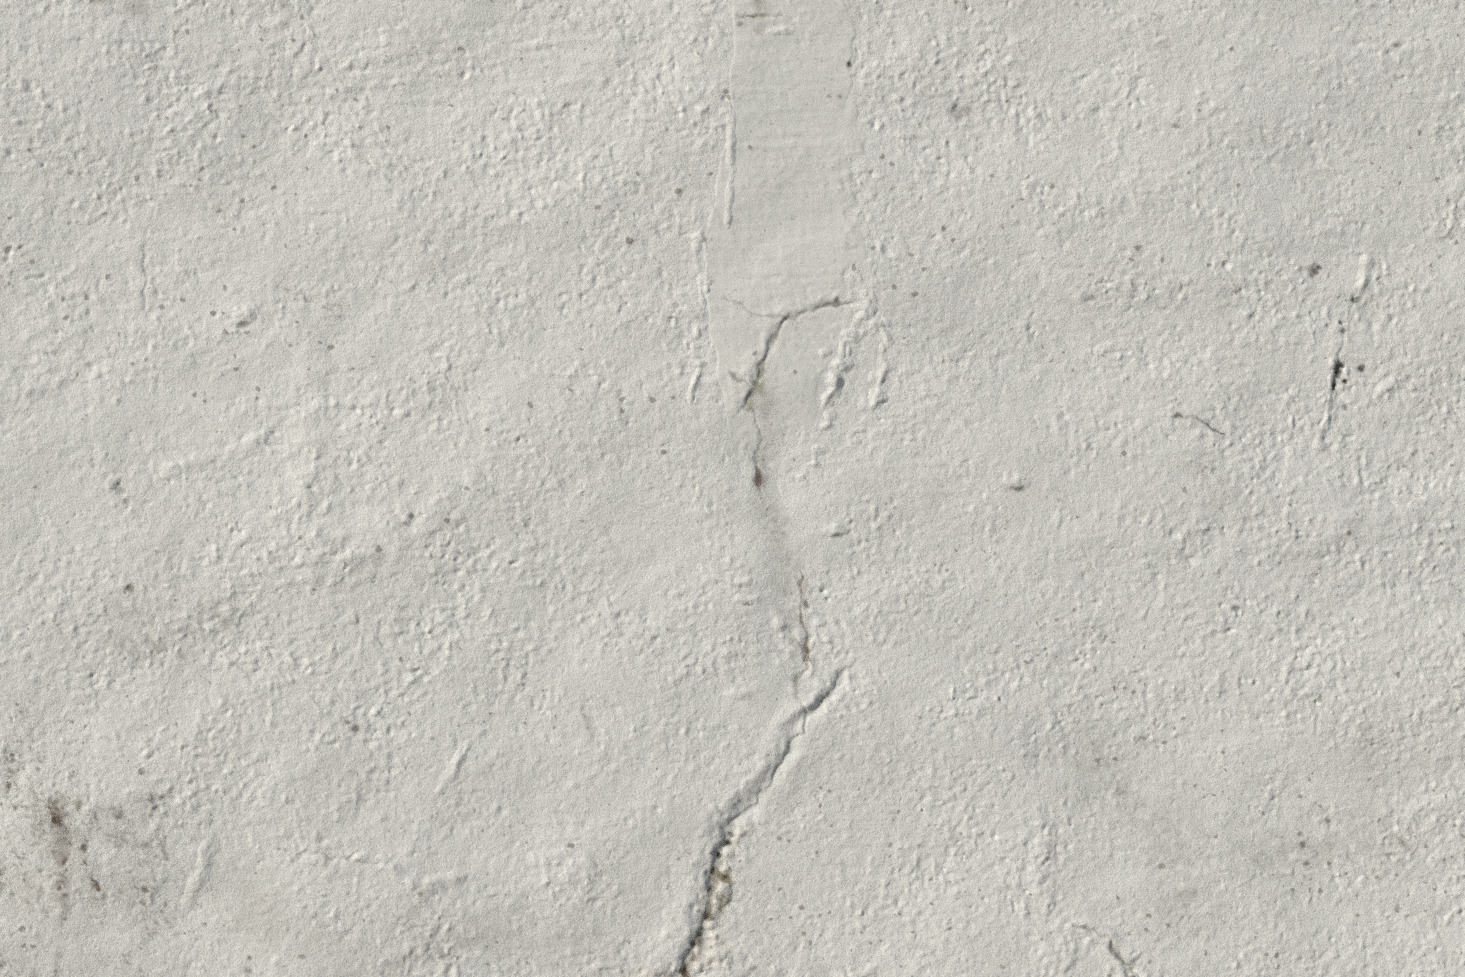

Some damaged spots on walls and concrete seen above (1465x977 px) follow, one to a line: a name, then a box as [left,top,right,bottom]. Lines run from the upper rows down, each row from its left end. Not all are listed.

crack [674,827,748,977]